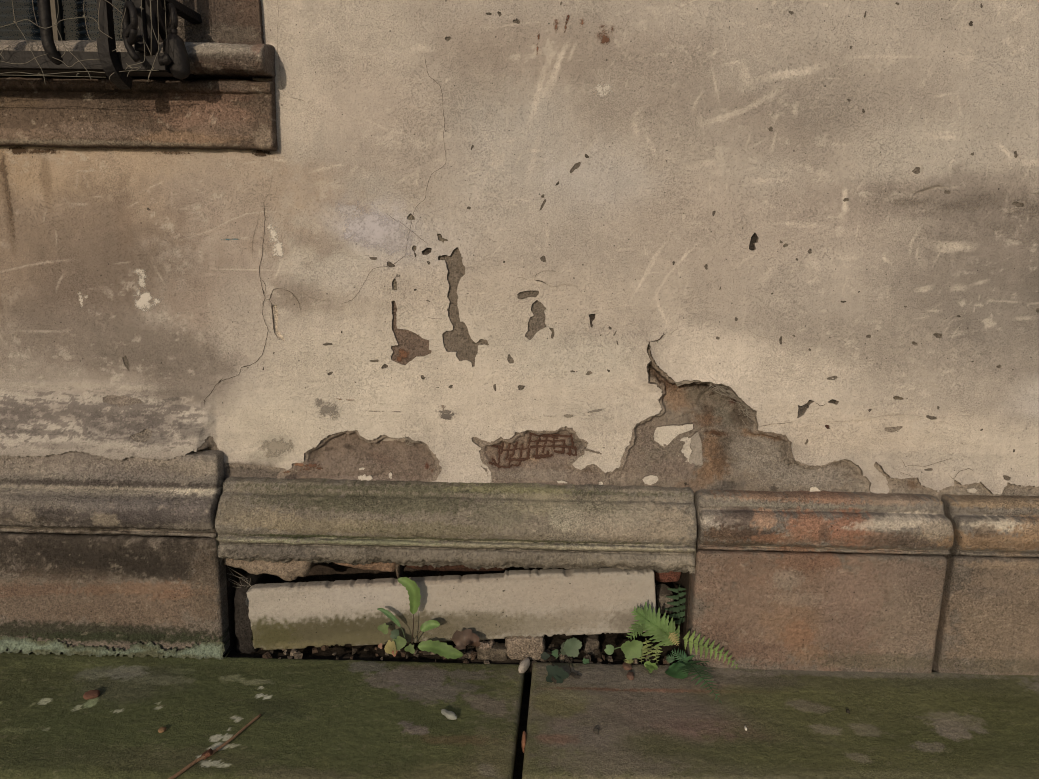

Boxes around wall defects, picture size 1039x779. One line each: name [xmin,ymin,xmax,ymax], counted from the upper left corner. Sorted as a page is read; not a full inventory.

damp [0,147,56,237]
crack [204,60,446,405]
damp [134,269,160,312]
flaking render [370,257,432,369]
flaking render [412,234,489,366]
flaking render [517,291,554,340]
flaking render [197,436,219,450]
flaking render [224,430,442,482]
rust [488,432,577,469]
flaking render [472,345,871,493]
flaking render [874,462,1039,501]